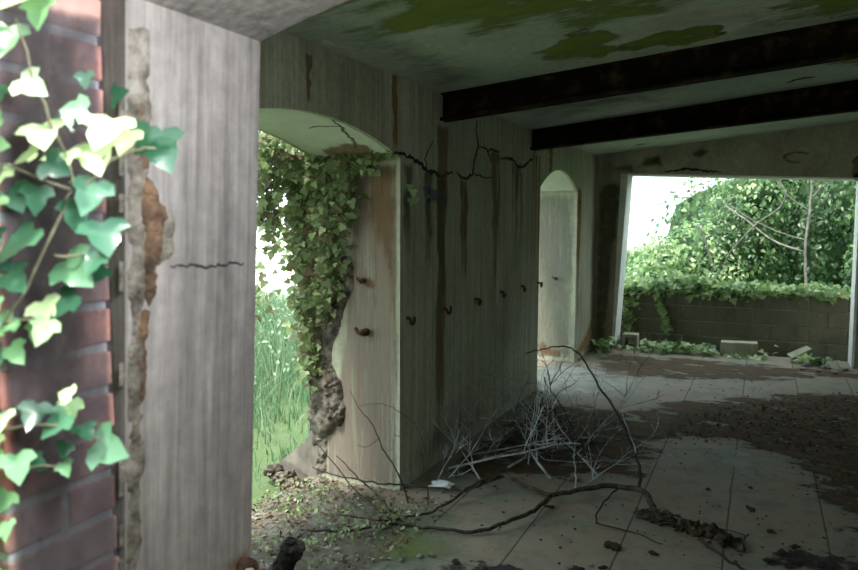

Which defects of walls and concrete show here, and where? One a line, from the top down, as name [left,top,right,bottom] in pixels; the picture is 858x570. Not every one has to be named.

crack [308,120,371,156]
crack [393,120,535,189]
spalling [119,27,176,570]
crack [170,261,244,269]
spalling [279,256,354,480]